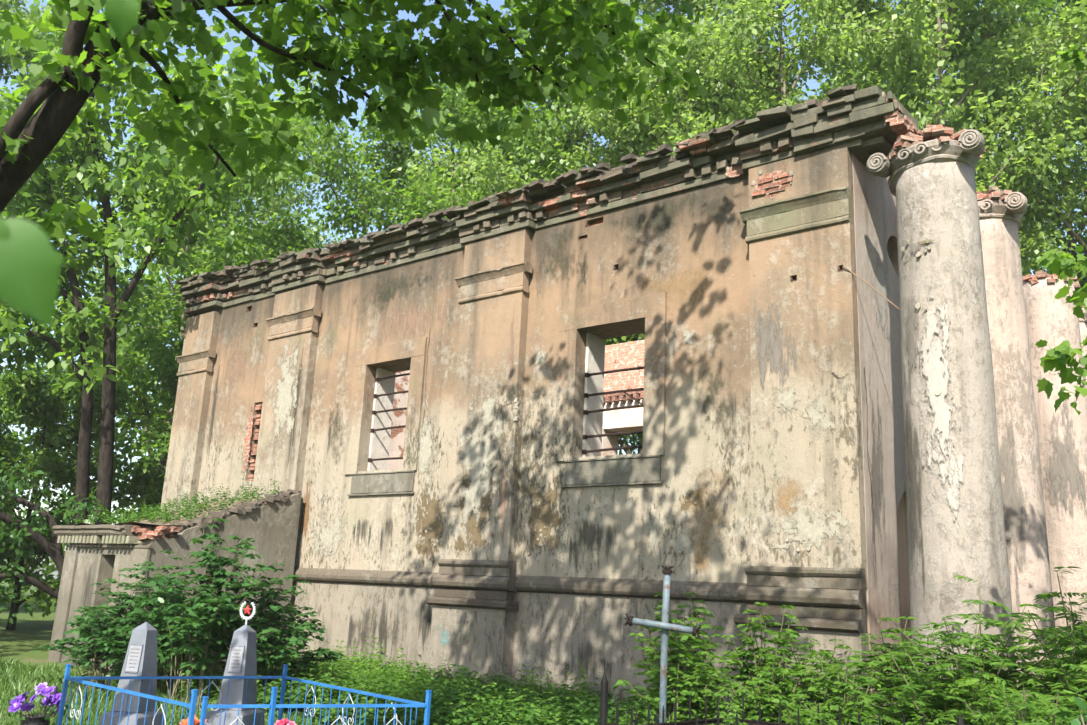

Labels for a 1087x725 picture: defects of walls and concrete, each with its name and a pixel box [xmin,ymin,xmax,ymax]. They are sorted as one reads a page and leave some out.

spalling [725,165,793,199]
spalling [241,406,253,479]
peeling [415,384,520,572]
leakage [569,521,616,567]
leakage [348,602,398,650]
leakage [419,605,432,644]